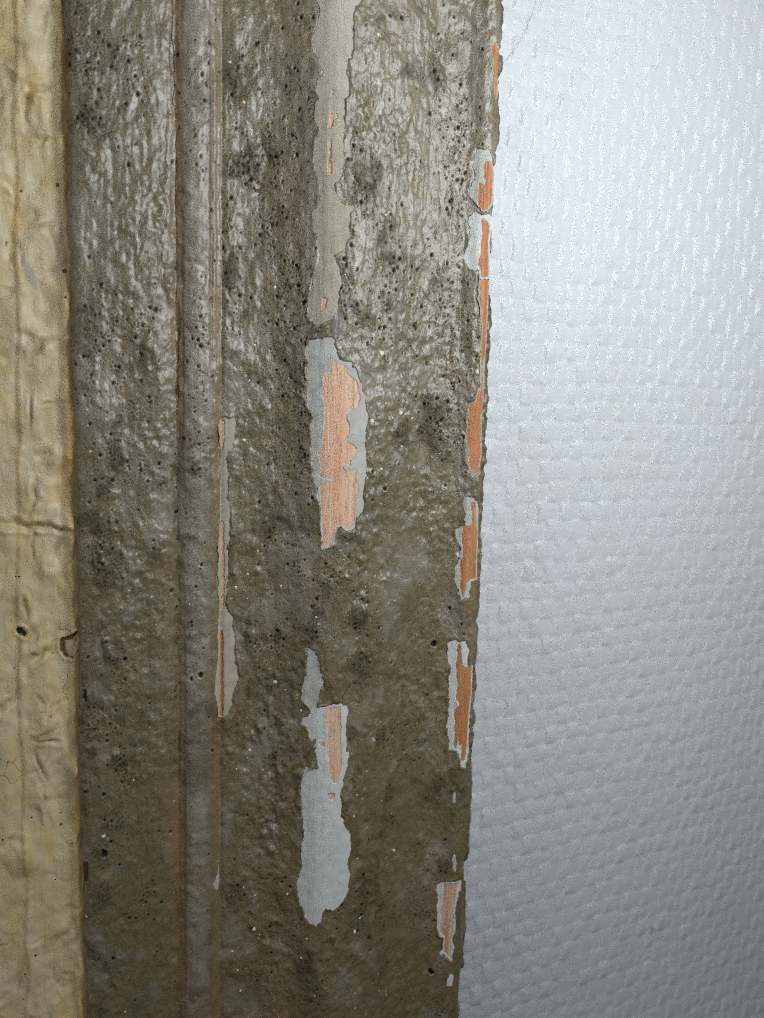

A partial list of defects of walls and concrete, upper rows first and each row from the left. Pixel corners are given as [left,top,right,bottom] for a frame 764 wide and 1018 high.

peeling [490,42,499,100]
peeling [306,0,369,550]
peeling [463,149,494,477]
peeling [214,417,239,718]
peeling [297,648,351,926]
peeling [436,880,461,961]
peeling [431,640,473,768]
peeling [454,497,479,600]